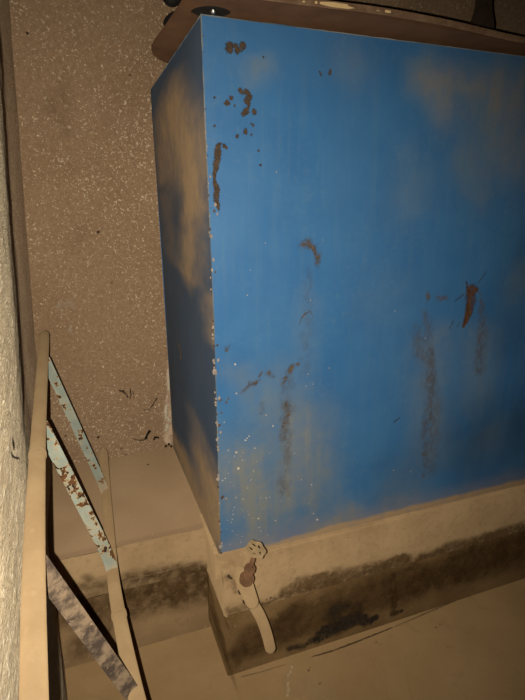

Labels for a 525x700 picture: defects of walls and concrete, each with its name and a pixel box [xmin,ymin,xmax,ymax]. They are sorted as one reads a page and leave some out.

corrosion [462,285,478,328]
leakage [78,590,110,626]
leakage [122,565,209,612]
leakage [269,526,525,651]
leakage [211,608,264,664]